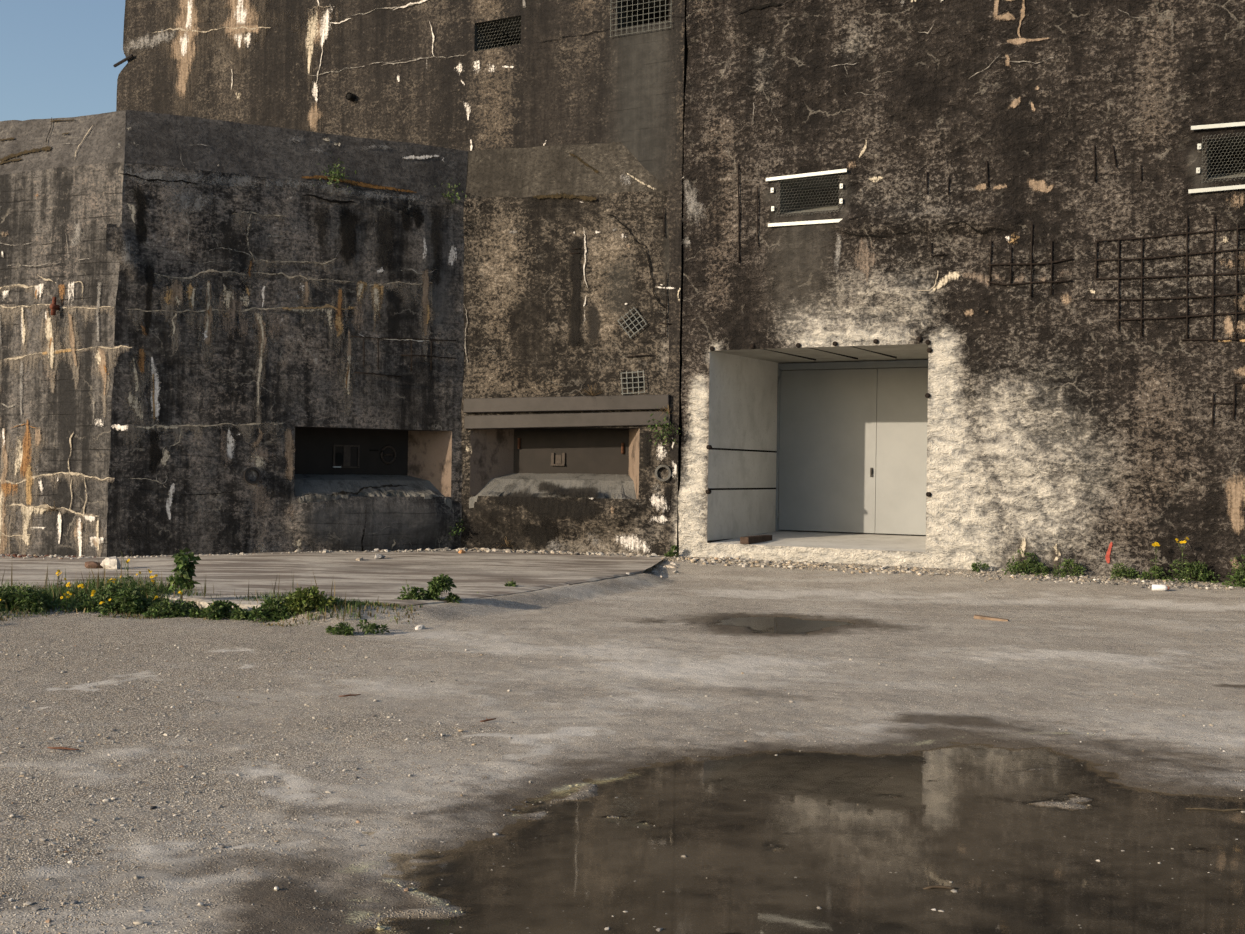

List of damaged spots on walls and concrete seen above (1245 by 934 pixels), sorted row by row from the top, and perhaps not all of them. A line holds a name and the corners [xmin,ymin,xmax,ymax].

efflorescence [159,0,270,116]
efflorescence [301,6,333,133]
crack [310,0,464,83]
rust [37,274,83,301]
water stain [134,186,147,243]
crack [0,211,436,426]
water stain [377,205,457,361]
spalling [917,224,1073,305]
spalling [1089,215,1245,342]
spalling [1208,366,1245,426]
rust [0,420,44,555]
crack [0,401,285,546]